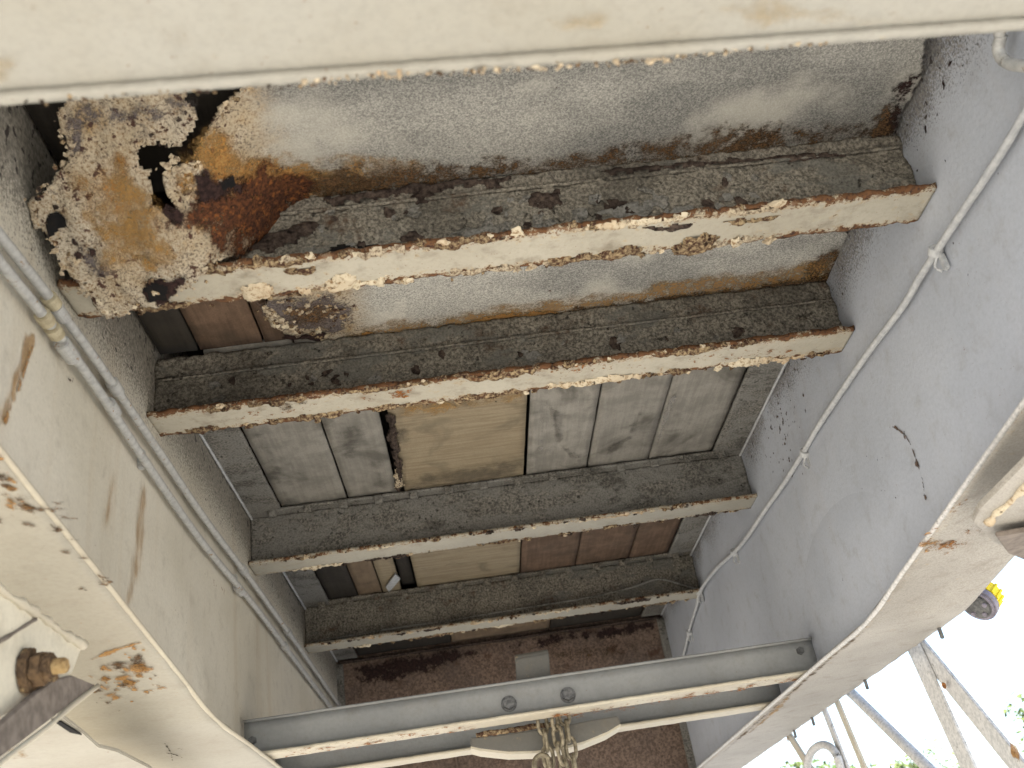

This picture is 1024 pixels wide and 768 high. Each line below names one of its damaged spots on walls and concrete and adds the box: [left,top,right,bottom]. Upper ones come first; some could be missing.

peeling [192,87,252,134]
peeling [134,133,215,210]
rust [24,38,927,319]
spalling [46,212,96,260]
peeling [278,210,378,276]
peeling [399,231,463,248]
peeling [479,176,787,259]
spalling [135,241,244,316]
rust [12,335,35,399]
peeling [395,365,485,388]
peeling [691,326,757,350]
rust [918,526,974,555]